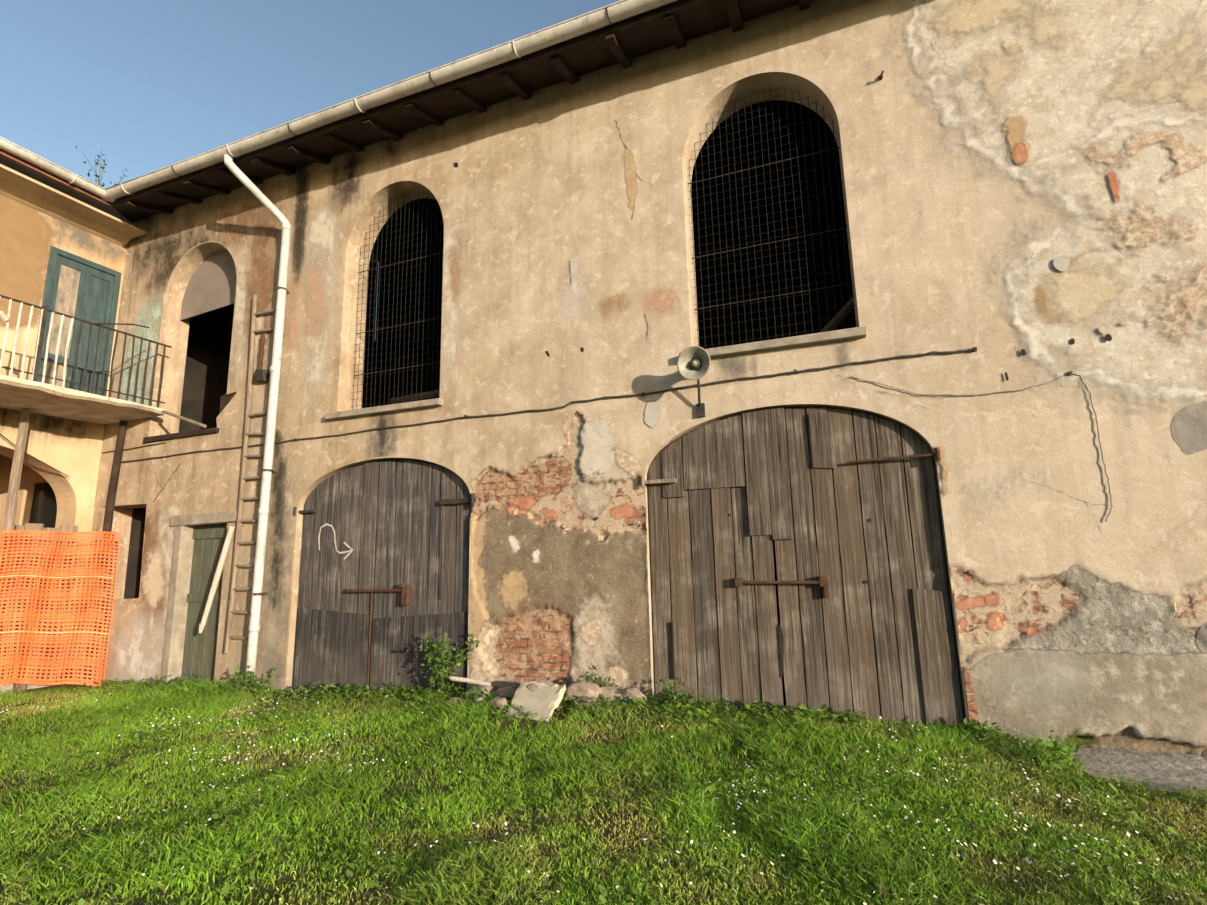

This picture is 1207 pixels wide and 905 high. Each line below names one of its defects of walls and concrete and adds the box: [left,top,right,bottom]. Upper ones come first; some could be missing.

damp [0,195,52,328]
peeling [905,0,1207,410]
spalling [469,411,651,695]
flaking render [951,566,1088,726]
flaking render [1174,579,1207,631]
spalling [1057,727,1207,756]